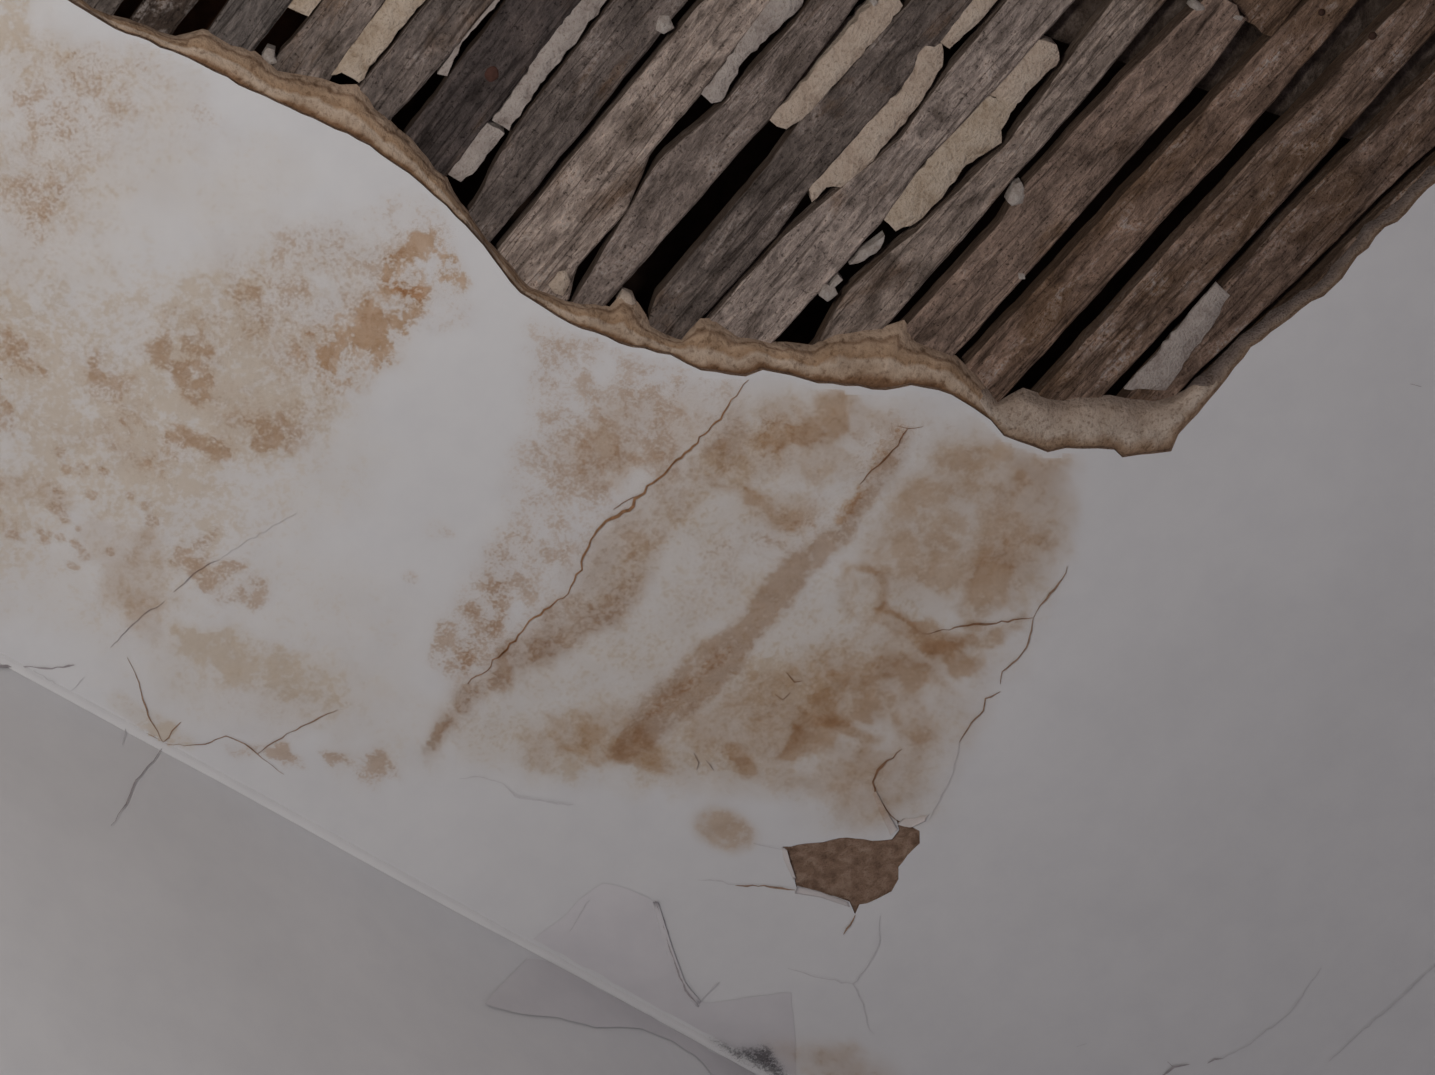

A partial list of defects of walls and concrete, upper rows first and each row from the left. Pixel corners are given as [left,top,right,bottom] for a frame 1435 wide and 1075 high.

spalling [72,0,1435,455]
crack [468,380,748,684]
crack [859,426,923,485]
crack [111,513,338,823]
crack [929,566,1068,820]
crack [702,879,793,890]
crack [788,916,881,1034]
spalling [782,749,928,912]